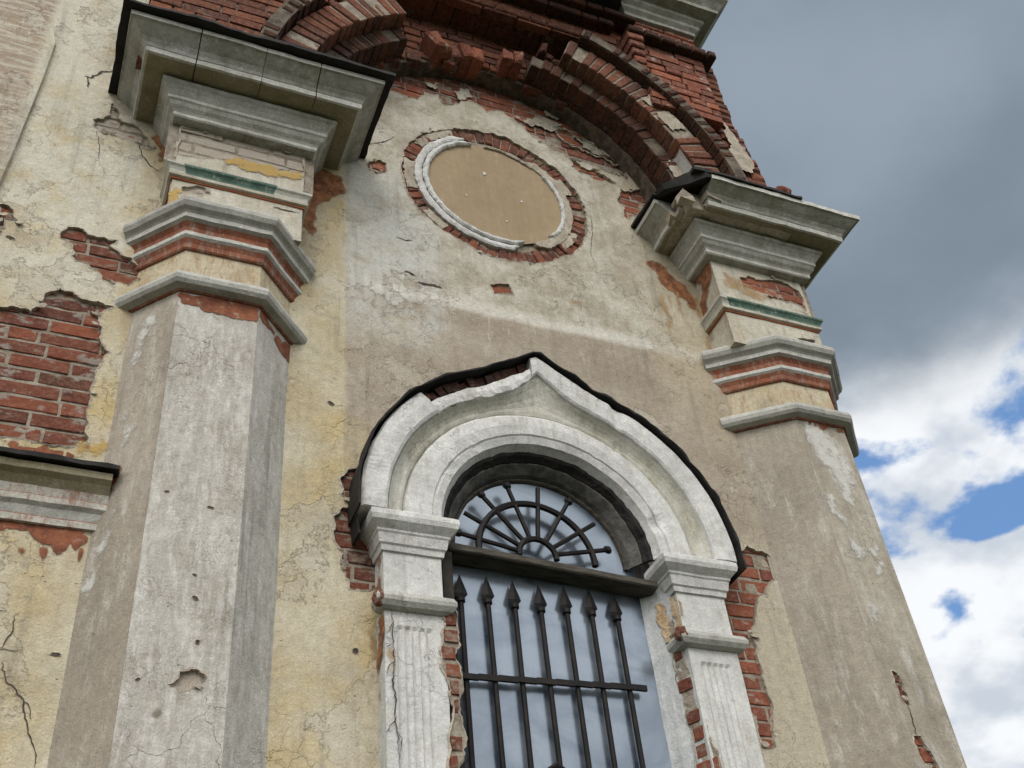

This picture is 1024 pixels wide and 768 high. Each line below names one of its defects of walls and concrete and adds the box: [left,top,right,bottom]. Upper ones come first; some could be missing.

crack [86,71,112,87]
flaking render [92,103,314,198]
flaking render [366,76,646,265]
flaking render [58,226,142,287]
flaking render [0,288,116,449]
flaking render [331,466,377,592]
crack [0,610,37,767]
flaking render [168,666,207,692]
crack [386,610,403,765]
flaking render [655,597,722,768]
flaking render [724,544,777,749]
flaking render [912,734,940,768]